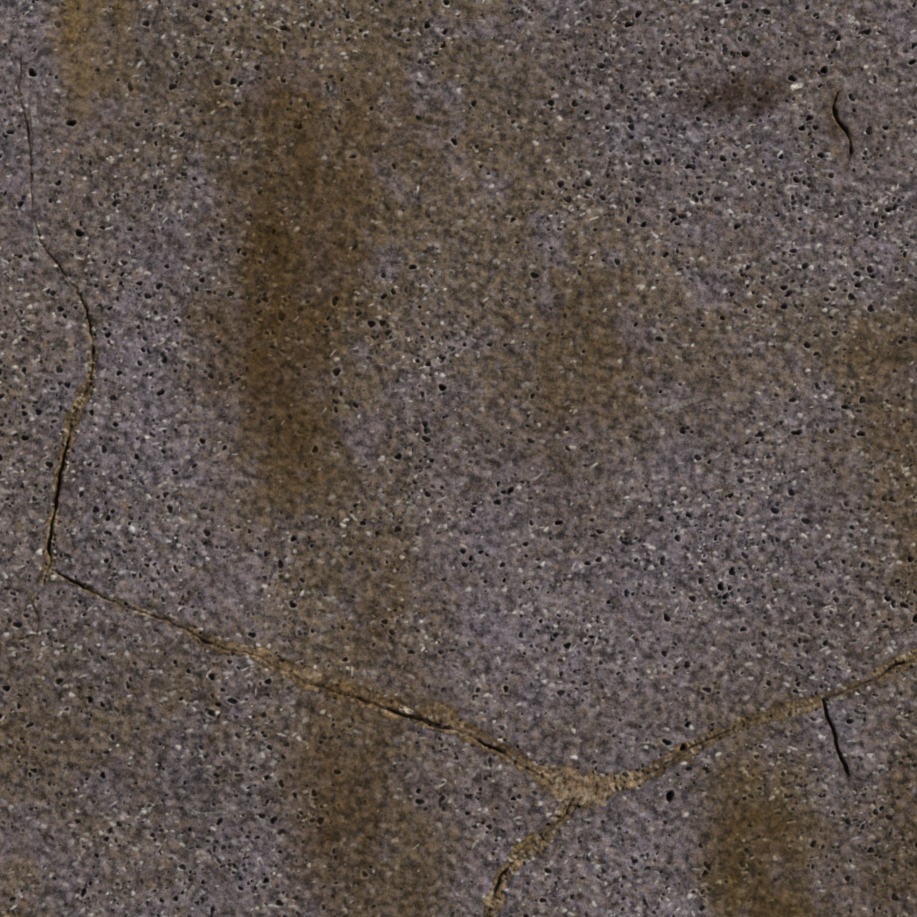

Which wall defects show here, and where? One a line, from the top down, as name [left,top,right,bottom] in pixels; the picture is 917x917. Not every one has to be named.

crack [826,90,853,160]
crack [18,57,126,612]
crack [19,596,40,640]
crack [133,604,917,917]